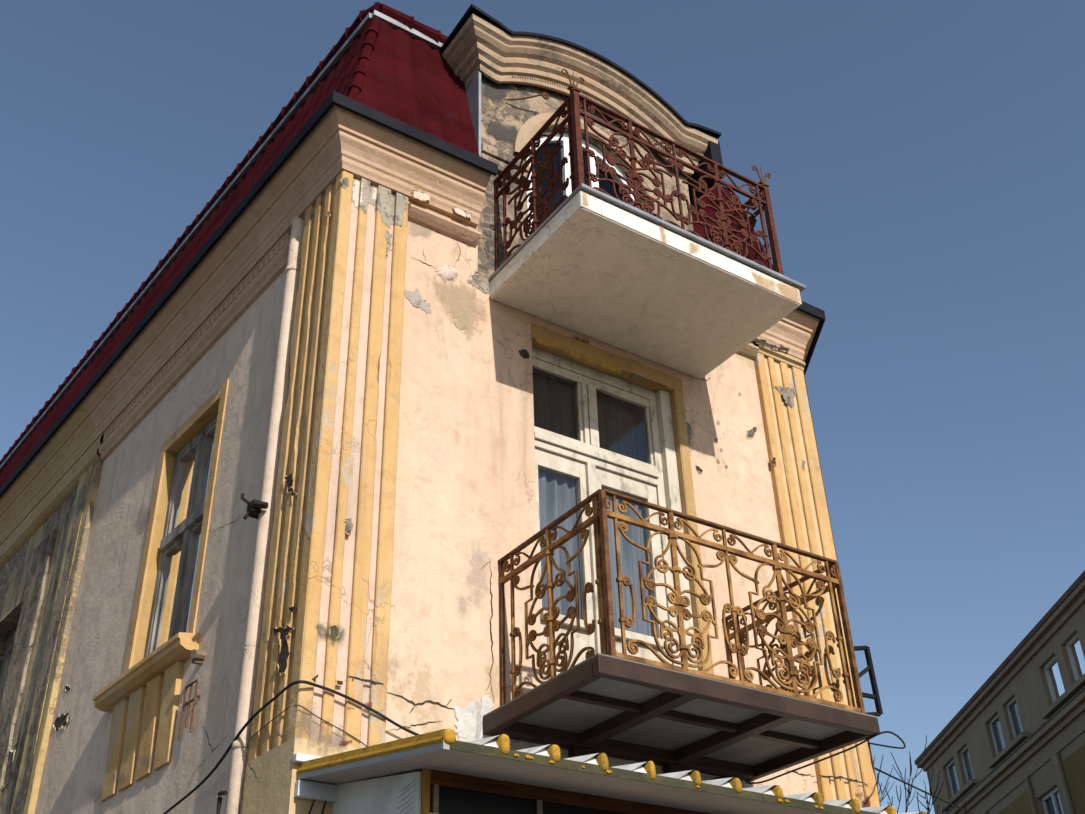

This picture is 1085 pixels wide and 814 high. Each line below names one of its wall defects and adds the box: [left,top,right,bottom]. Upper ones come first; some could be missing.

peeling [340,177,431,257]
peeling [404,289,431,313]
spalling [775,386,796,408]
flaking render [0,483,85,814]
crack [480,560,494,698]
crack [347,675,454,731]